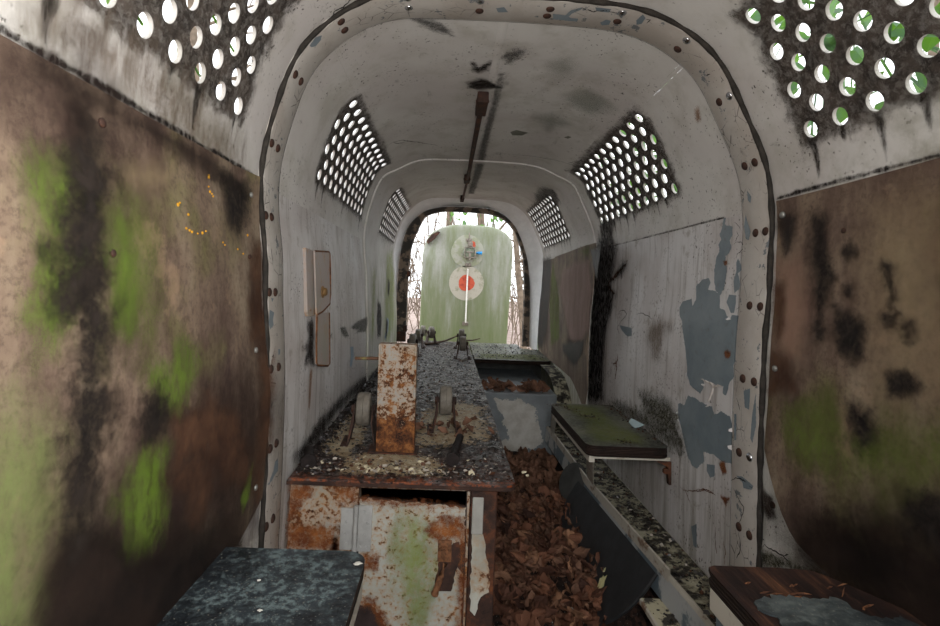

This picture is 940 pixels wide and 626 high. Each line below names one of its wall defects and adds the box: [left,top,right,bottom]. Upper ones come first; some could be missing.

water stain [0,0,367,626]
water stain [526,103,723,467]
peeling [676,215,756,478]
water stain [725,0,940,464]
corrosion [285,485,472,626]
water stain [760,486,940,626]